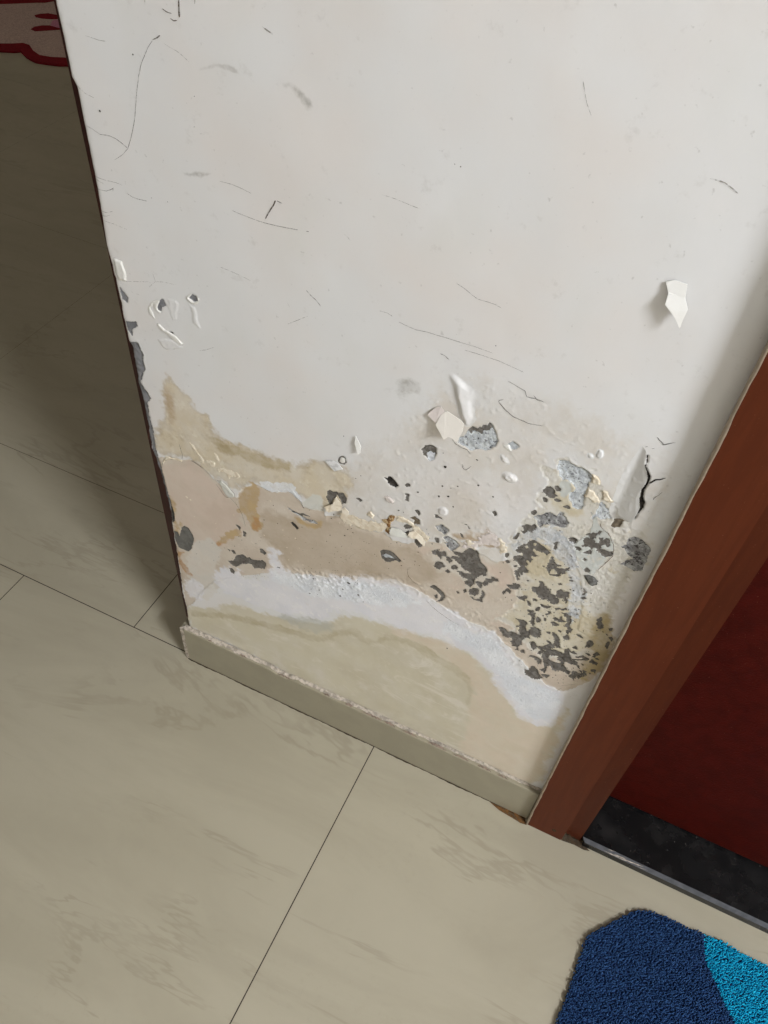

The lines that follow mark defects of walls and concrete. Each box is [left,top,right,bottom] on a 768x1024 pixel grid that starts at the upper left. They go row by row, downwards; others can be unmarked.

peeling [148,299,166,319]
peeling [186,294,200,305]
peeling [665,280,688,328]
flaking render [126,321,658,692]
leakage [150,339,709,606]
crack [635,437,671,518]
leakage [181,541,621,787]